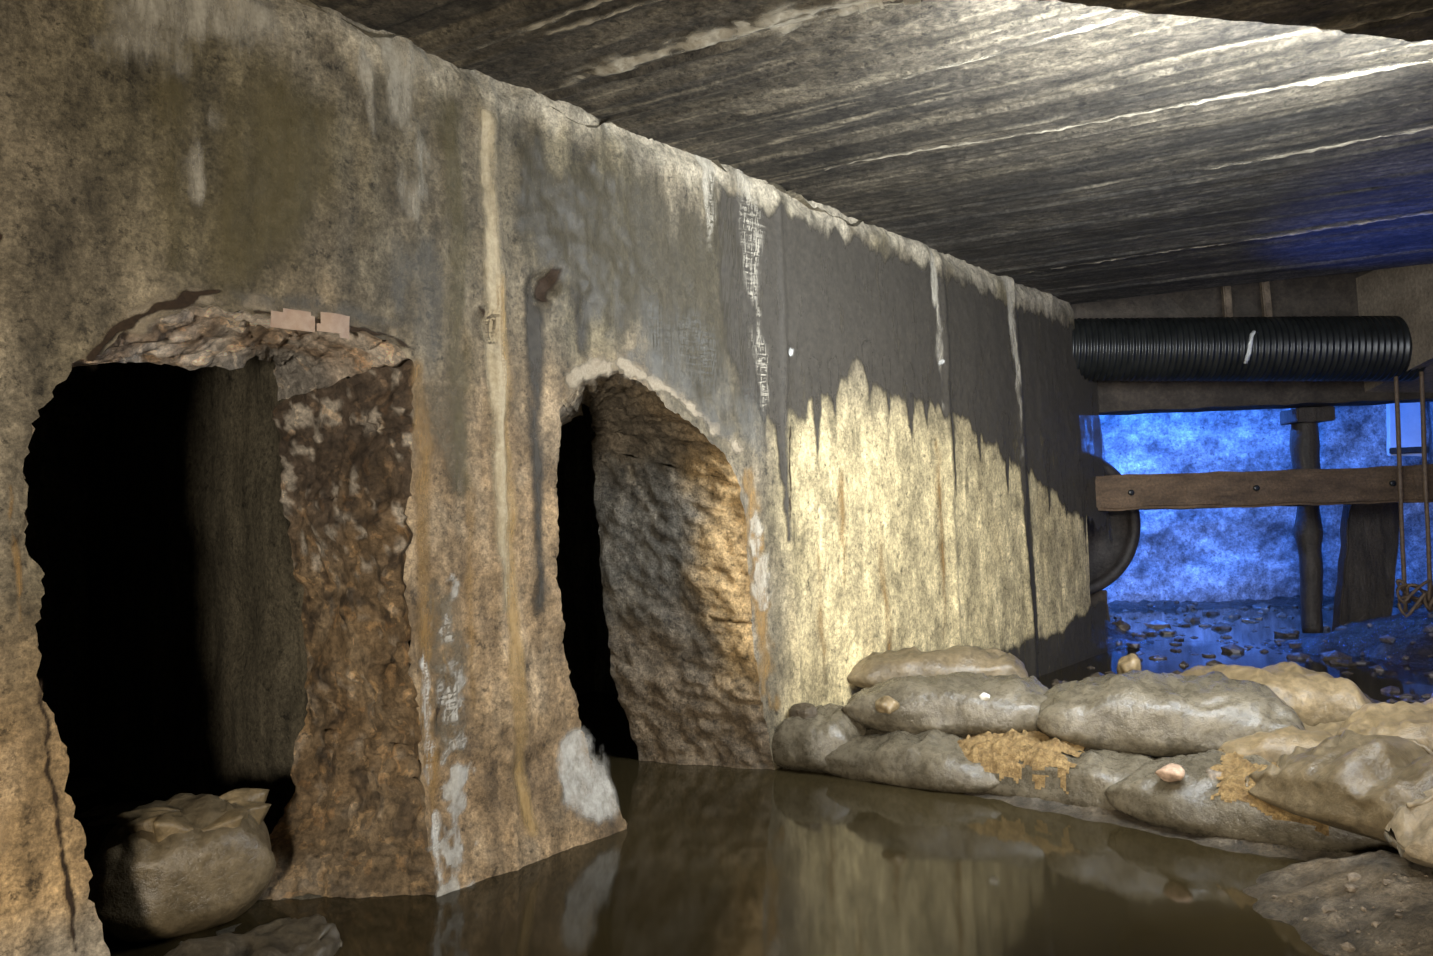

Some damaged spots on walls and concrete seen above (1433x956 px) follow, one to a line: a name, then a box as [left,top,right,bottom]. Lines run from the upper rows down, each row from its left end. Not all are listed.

leakage [825,61,1433,171]
spalling [86,288,221,361]
leakage [480,109,525,707]
leakage [517,133,1112,678]
crack [38,684,77,952]
efflorescence [420,657,472,897]
leakage [516,755,536,835]
efflorescence [560,731,616,821]